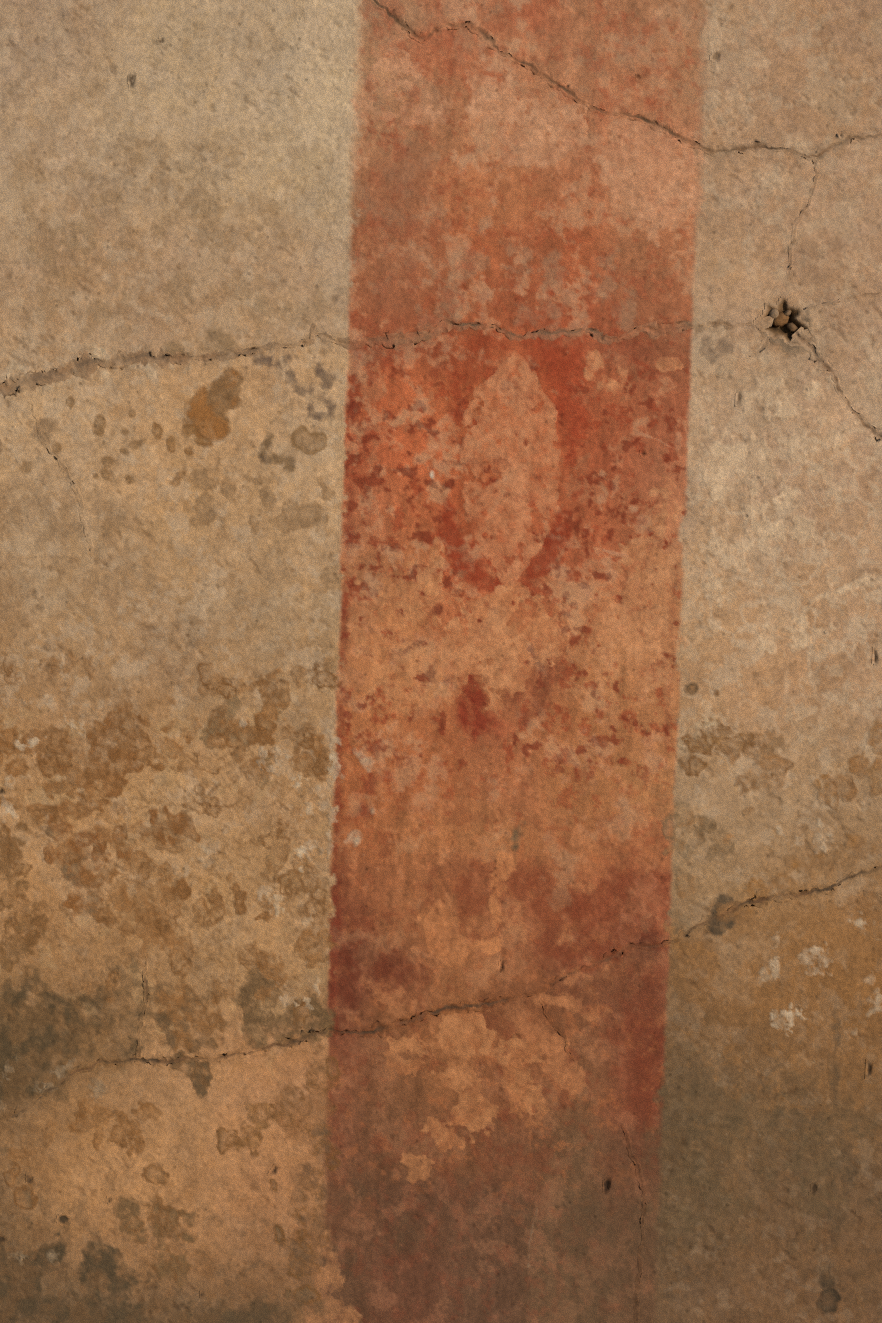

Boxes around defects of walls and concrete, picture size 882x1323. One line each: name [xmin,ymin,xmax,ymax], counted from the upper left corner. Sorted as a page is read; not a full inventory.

leakage [25,125,173,290]
leakage [0,272,341,552]
leakage [150,180,266,264]
crack [0,0,882,551]
leakage [0,571,51,633]
leakage [0,648,375,1323]
crack [0,863,882,1121]
leakage [634,970,882,1323]